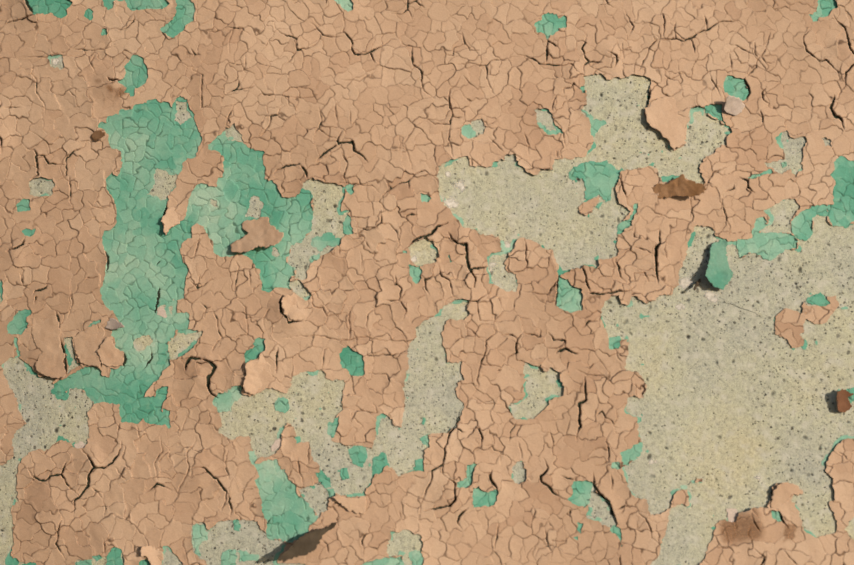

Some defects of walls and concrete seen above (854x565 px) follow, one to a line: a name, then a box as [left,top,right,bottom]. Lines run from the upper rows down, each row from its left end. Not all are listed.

peeling [27,0,73,18]
peeling [103,0,195,38]
crack [279,114,366,185]
spalling [421,73,749,313]
crack [363,214,482,280]
crack [644,232,661,280]
peeling [0,54,354,565]
crack [185,357,217,397]
spalling [601,156,854,565]
crack [34,452,119,511]
spalling [191,301,470,565]
crack [425,404,521,524]